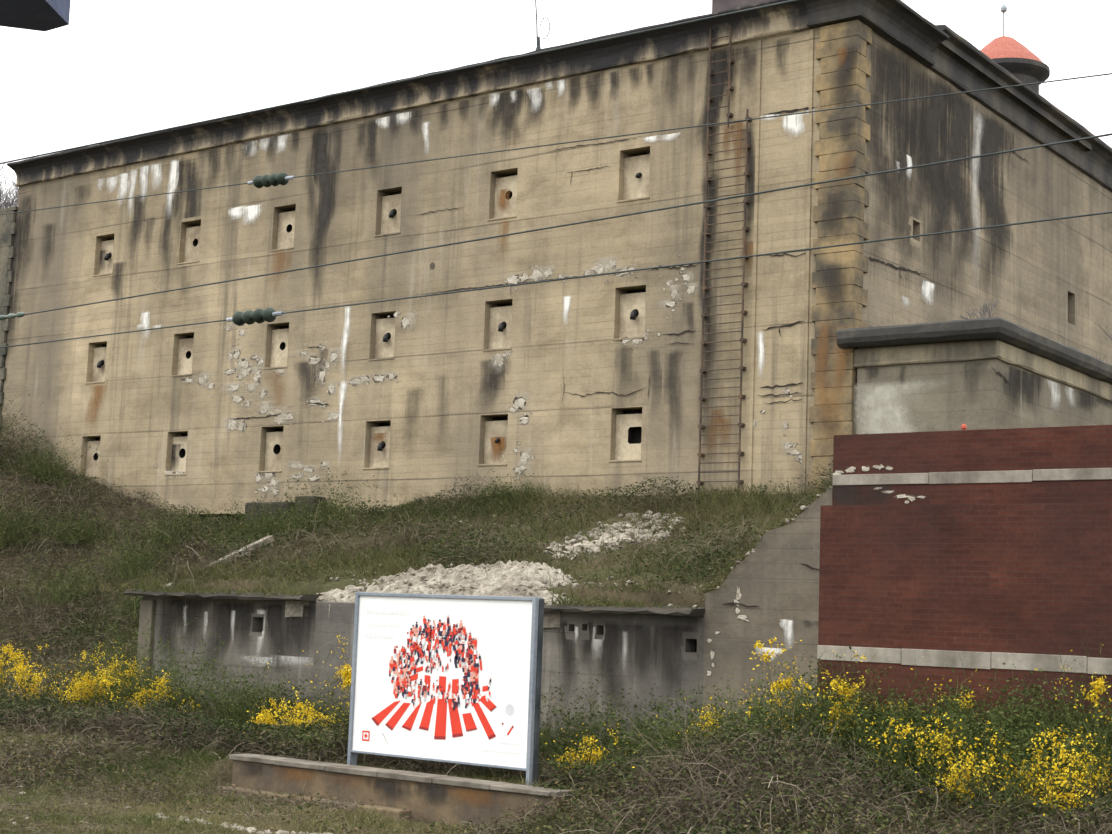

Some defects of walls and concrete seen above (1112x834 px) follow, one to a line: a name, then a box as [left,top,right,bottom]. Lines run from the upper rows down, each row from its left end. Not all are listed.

leakage [491,72,617,129]
leakage [869,47,1014,270]
leakage [99,160,197,252]
leakage [229,205,260,222]
spalling [504,258,639,294]
crack [766,320,805,337]
spalling [181,325,293,432]
crack [562,375,650,403]
crack [759,383,801,404]
corrosion [491,437,505,454]
spalling [833,464,893,475]
peeling [874,487,927,504]